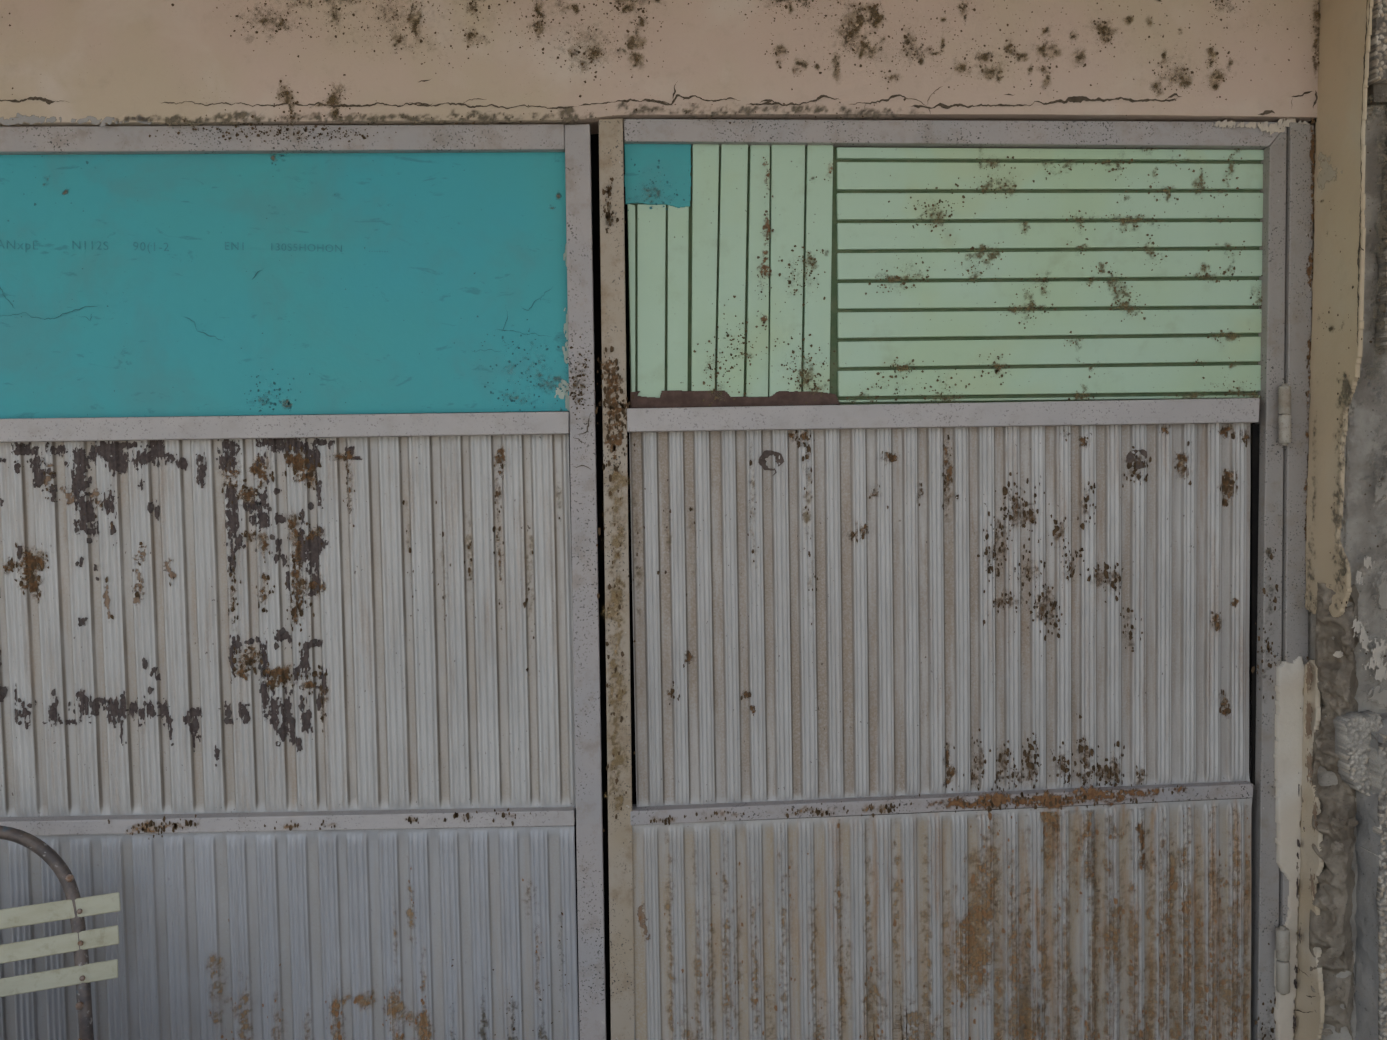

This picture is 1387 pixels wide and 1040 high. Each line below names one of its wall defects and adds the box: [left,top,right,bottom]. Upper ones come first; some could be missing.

water stain [273,75,301,123]
water stain [317,74,359,131]
crack [163,79,1182,111]
water stain [719,0,1321,109]
rust [221,443,355,527]
rust [3,542,49,603]
rust [227,515,326,646]
rust [595,346,645,832]
rust [977,472,1143,652]
rust [230,646,329,733]
spalling [1294,556,1387,1040]
rust [637,728,1276,1040]